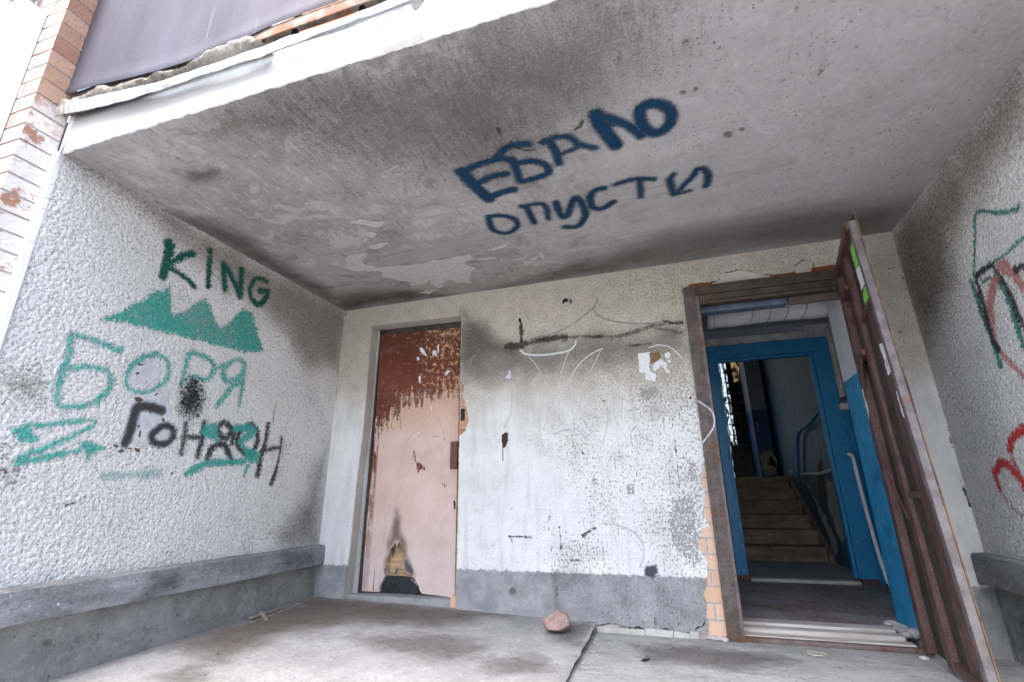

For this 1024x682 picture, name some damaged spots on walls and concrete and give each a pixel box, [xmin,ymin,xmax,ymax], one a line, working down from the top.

peeling [344,219,544,294]
spalling [682,270,772,293]
spalling [794,259,814,274]
spalling [460,382,468,435]
spalling [667,457,729,643]